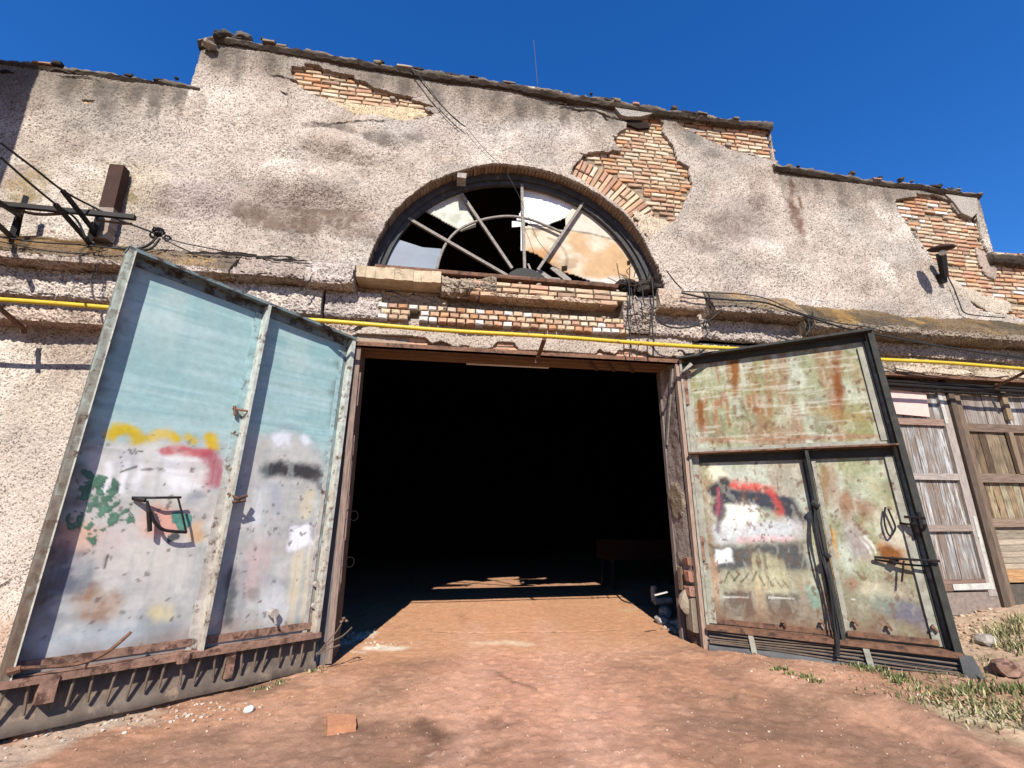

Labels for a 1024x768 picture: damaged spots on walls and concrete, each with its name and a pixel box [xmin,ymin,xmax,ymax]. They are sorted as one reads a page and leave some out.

flaking render [292,67,441,121]
flaking render [678,122,778,164]
flaking render [571,107,691,240]
rust [789,184,803,229]
flaking render [895,194,1024,319]
rust [731,359,739,386]